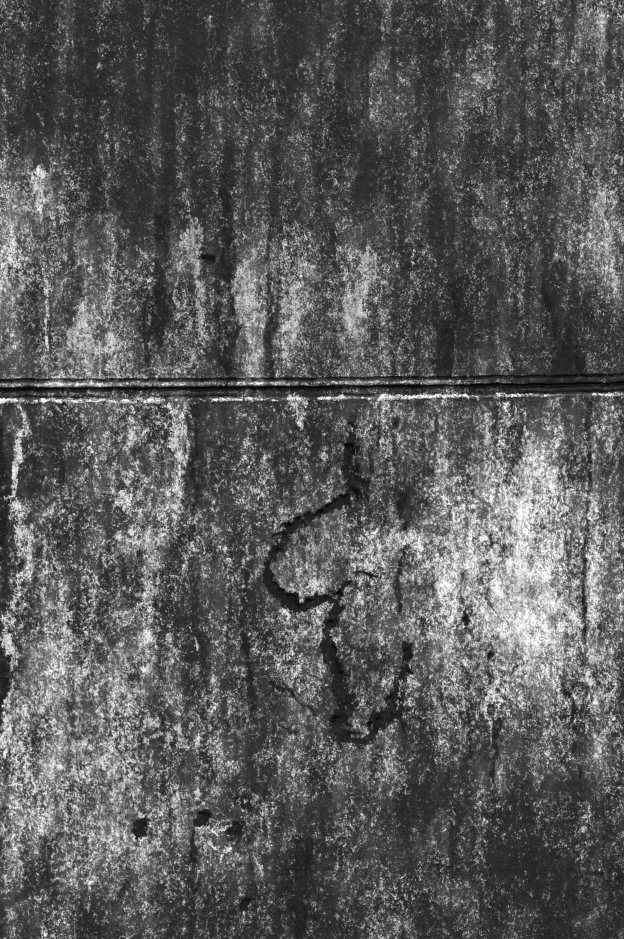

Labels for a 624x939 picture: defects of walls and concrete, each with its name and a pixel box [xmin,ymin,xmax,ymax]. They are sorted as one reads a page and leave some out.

water stain [30,164,47,214]
water stain [0,230,22,302]
water stain [42,268,51,351]
water stain [213,174,242,381]
water stain [263,213,278,379]
water stain [430,275,462,380]
water stain [541,282,586,383]
water stain [595,193,619,297]
crack [263,431,413,749]